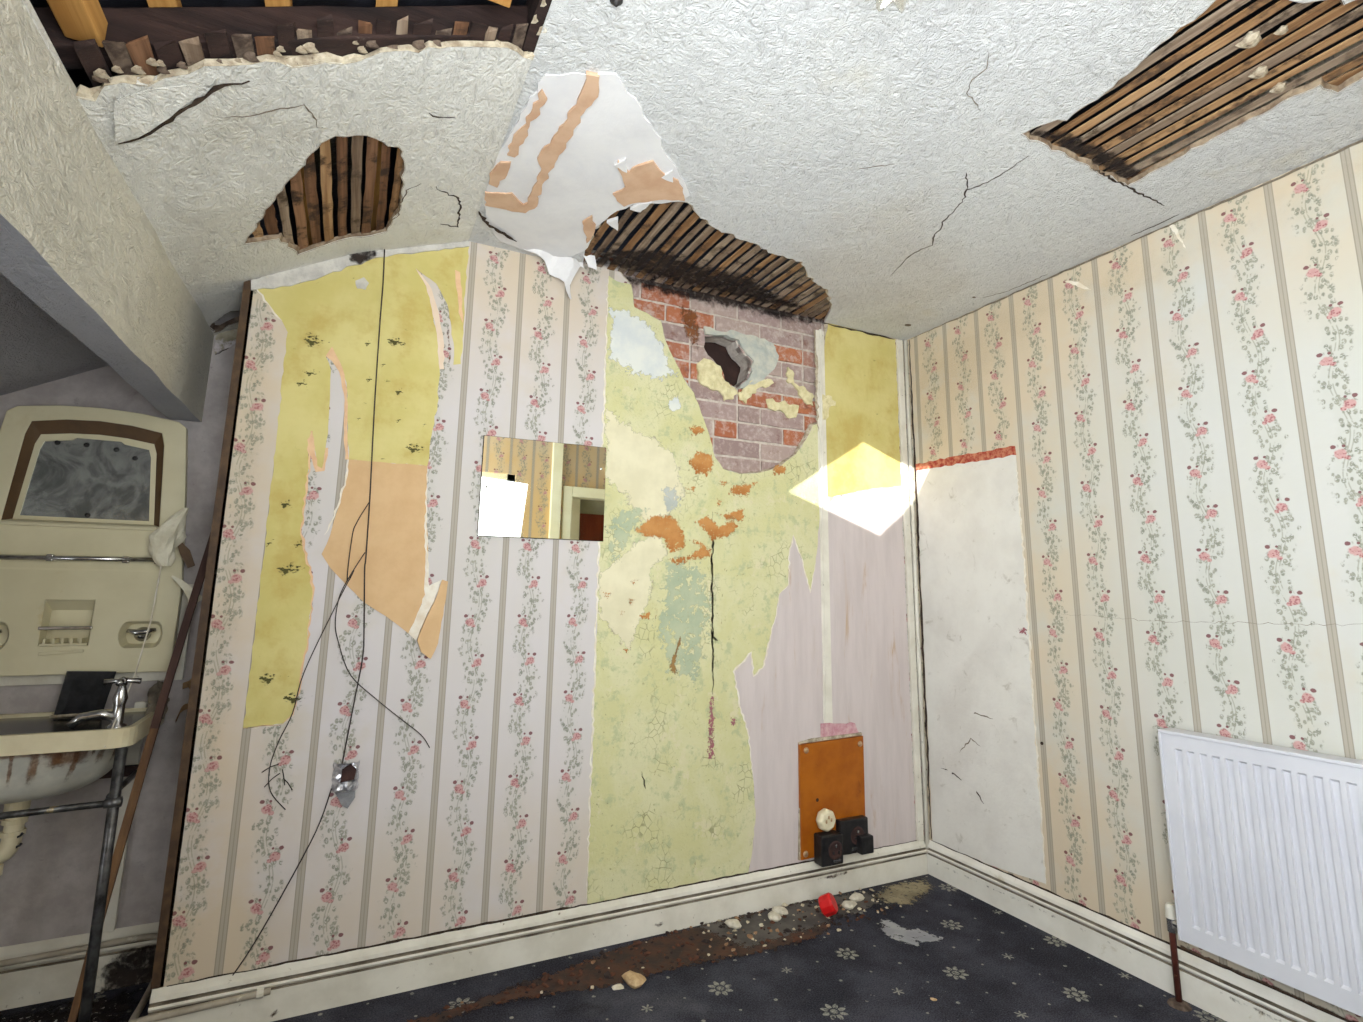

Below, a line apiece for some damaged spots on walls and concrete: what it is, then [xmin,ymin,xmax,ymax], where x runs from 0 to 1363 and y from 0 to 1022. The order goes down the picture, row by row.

crack [226,104,317,127]
crack [966,56,989,111]
flaking render [1021,0,1363,186]
peeling [243,135,470,729]
peeling [583,202,901,904]
crack [167,139,1363,1022]
corrosion [0,749,115,782]